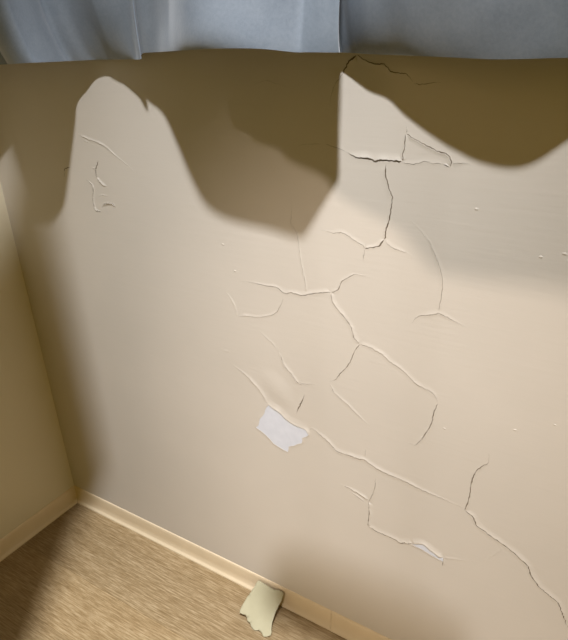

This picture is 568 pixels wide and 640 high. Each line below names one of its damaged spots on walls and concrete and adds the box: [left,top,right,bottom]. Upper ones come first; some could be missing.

crack [78,133,141,178]
crack [225,163,439,445]
crack [410,220,468,329]
peeling [230,362,311,453]
peeling [339,474,472,566]
crack [310,427,568,628]